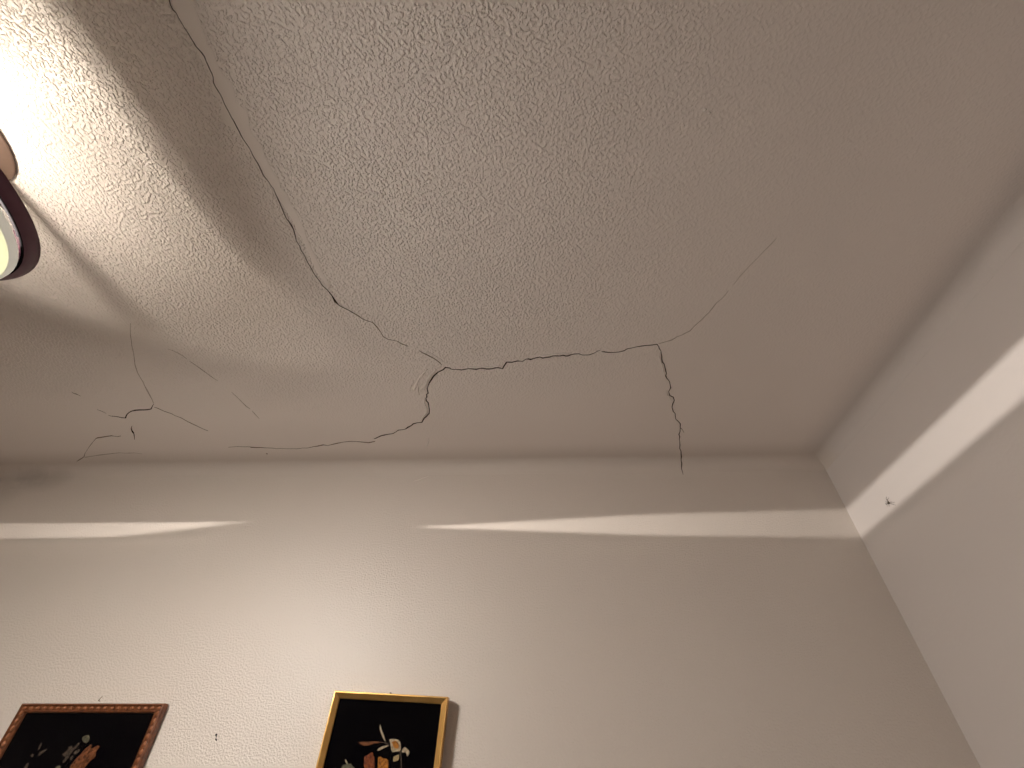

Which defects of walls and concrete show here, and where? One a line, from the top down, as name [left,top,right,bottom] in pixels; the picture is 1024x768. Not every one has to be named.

crack [169,0,776,473]